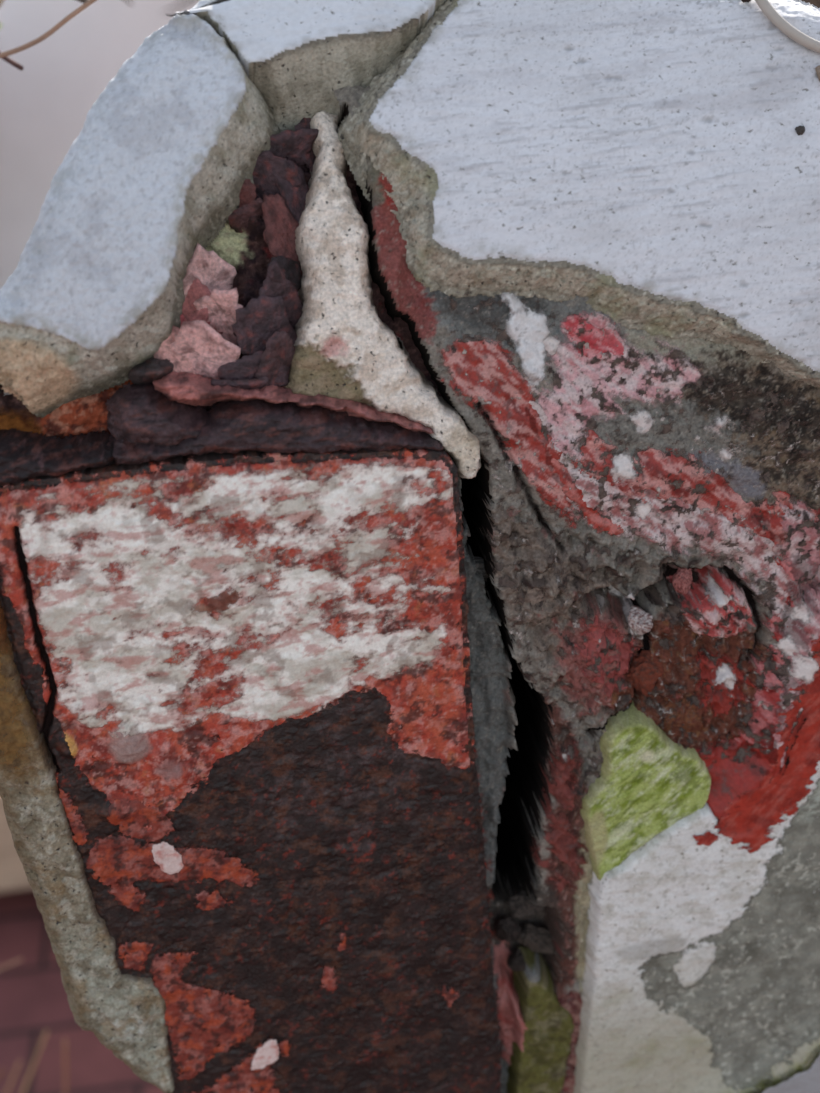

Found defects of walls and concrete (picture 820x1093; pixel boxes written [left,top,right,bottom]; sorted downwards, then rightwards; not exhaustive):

crack [167,0,230,17]
crack [338,103,349,127]
spalling [206,215,274,308]
rust [0,117,444,486]
spalling [371,281,442,397]
spalling [0,384,41,424]
crack [356,171,561,902]
peeling [705,576,732,608]
peeling [780,571,816,623]
rust [0,600,32,776]
peeling [715,663,736,689]
peeling [185,1038,291,1093]